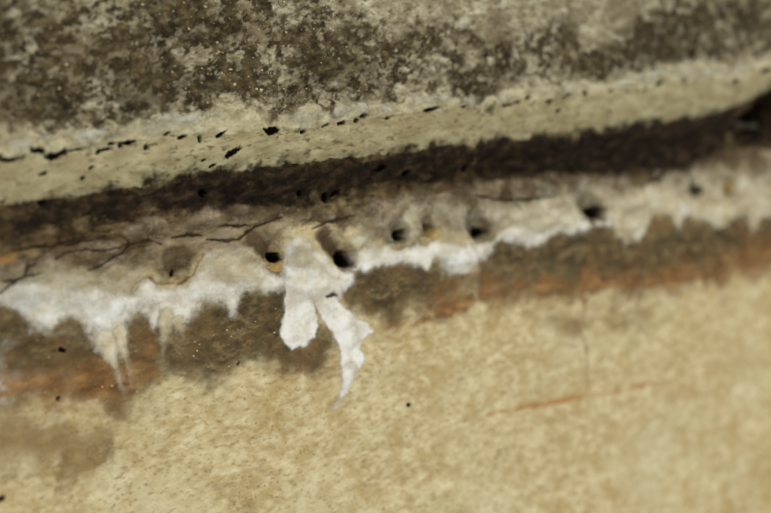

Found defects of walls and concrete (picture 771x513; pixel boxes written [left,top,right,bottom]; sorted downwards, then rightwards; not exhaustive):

leakage [0,0,771,148]
crack [502,91,586,107]
crack [321,114,364,127]
crack [164,131,225,143]
crack [263,127,303,136]
crack [0,140,148,163]
crack [642,169,669,190]
crack [471,194,557,210]
leakage [0,149,771,398]
corrosion [486,394,592,416]